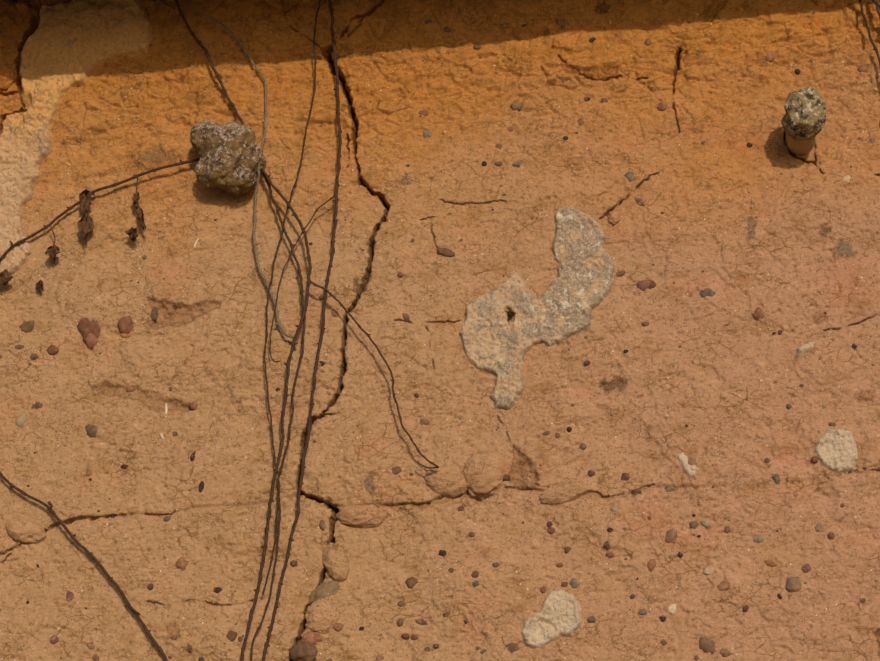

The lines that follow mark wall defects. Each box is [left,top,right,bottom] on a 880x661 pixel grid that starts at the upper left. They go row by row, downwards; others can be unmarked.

crack [0,8,40,134]
crack [558,46,682,133]
flaking render [0,0,153,275]
crack [420,199,516,248]
crack [599,172,659,226]
crack [263,0,390,545]
flaking render [459,206,615,410]
flaking render [814,429,858,473]
crack [44,507,186,532]
crack [367,496,444,507]
crack [289,566,326,661]
flaking render [521,590,582,649]